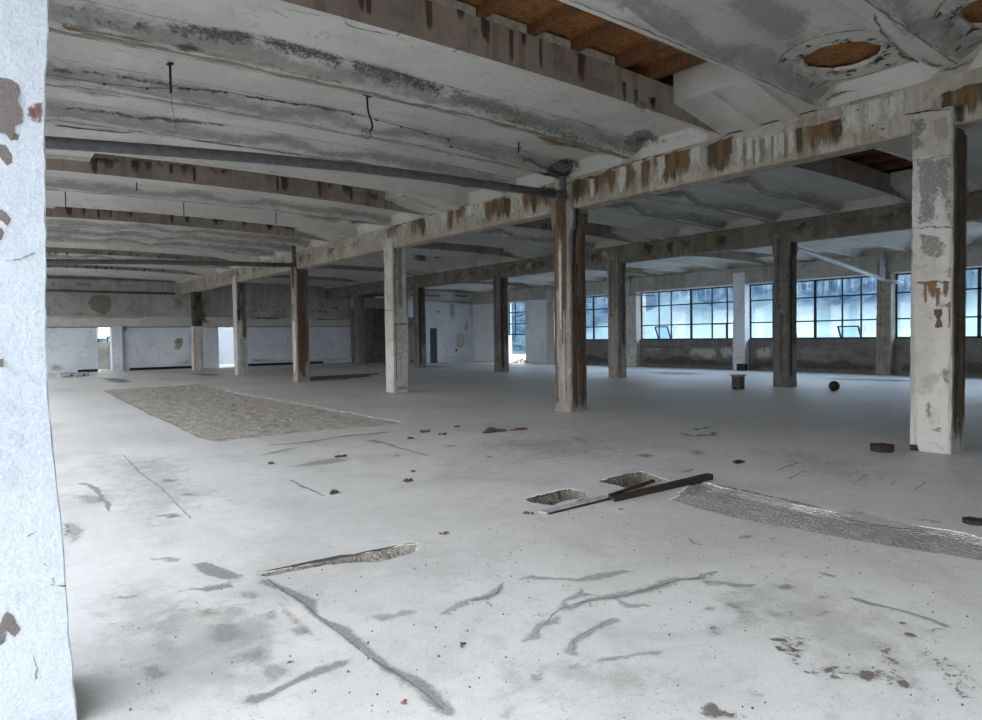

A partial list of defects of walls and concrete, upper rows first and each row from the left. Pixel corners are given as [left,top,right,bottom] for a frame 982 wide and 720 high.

peeling [0,78,42,165]
rust [706,136,733,170]
rust [796,118,843,154]
peeling [0,210,11,240]
rust [485,196,510,218]
rust [917,280,950,327]
crack [124,456,191,518]
spalling [526,488,588,505]
crack [442,584,502,614]
peeling [0,612,20,645]
crack [524,570,716,668]
crack [246,579,452,715]